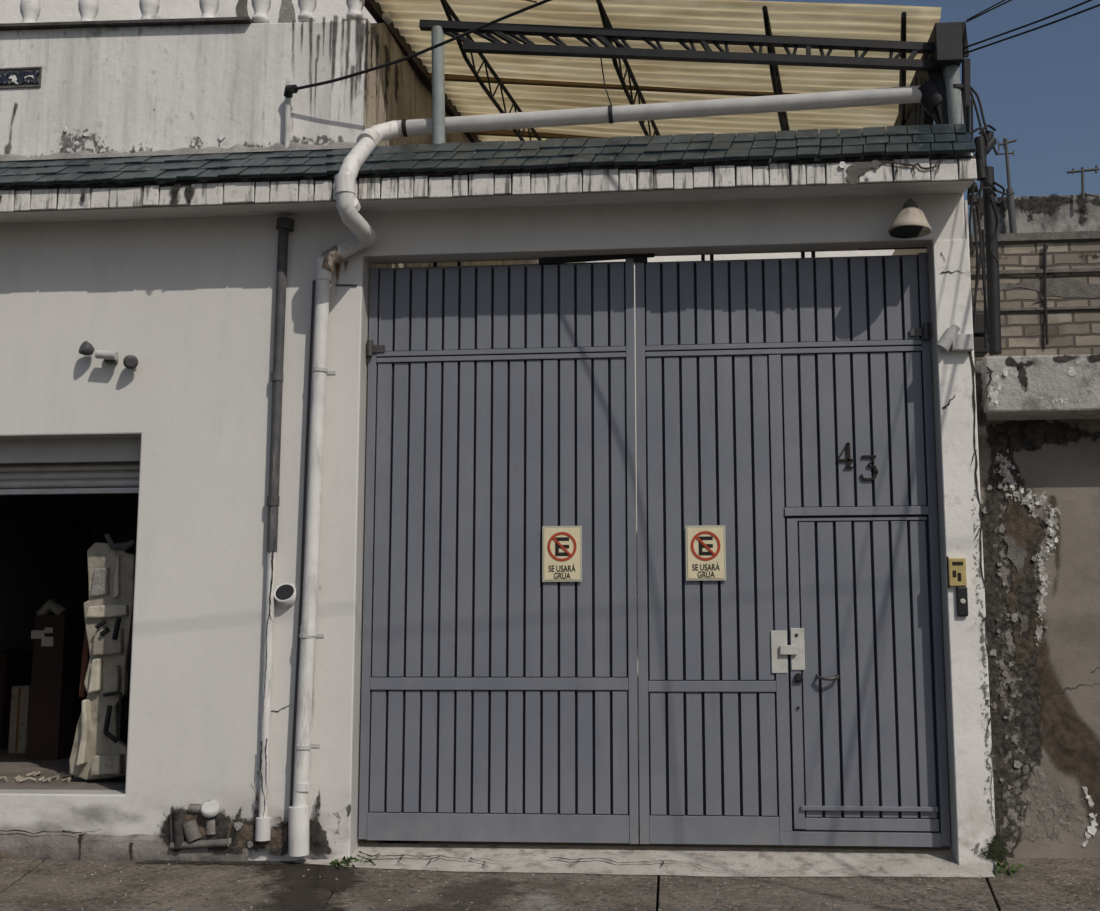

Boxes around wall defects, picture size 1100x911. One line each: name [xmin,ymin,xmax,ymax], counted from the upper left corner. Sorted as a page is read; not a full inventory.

spalling [236,0,249,17]
spalling [278,0,296,23]
leakage [292,14,399,108]
peeling [31,125,152,157]
peeling [184,130,225,149]
peeling [243,135,344,148]
leakage [975,371,1100,857]
peeling [971,486,1098,859]
spalling [184,813,206,836]
spalling [227,817,288,849]